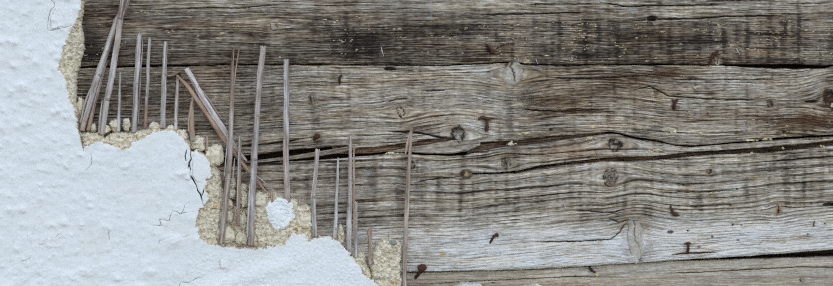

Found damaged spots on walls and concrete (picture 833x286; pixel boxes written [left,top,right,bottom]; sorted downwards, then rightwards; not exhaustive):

spalling [50,0,313,249]
crack [159,150,204,241]
spalling [337,224,402,286]